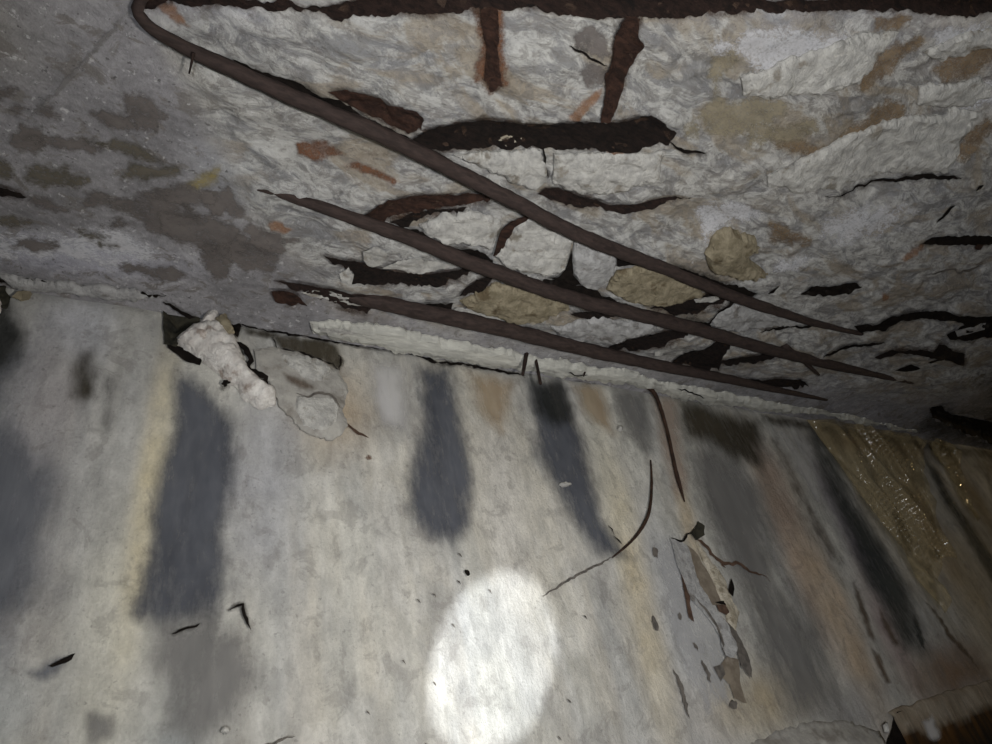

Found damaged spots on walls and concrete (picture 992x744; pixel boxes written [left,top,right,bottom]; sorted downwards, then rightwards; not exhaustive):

rust [460,0,508,95]
rust [297,141,342,161]
rust [351,162,396,185]
spalling [131,0,914,401]
peeling [767,75,992,194]
damp [177,310,276,410]
peeling [249,328,368,441]
damp [412,370,469,538]
damp [533,384,621,554]
damp [135,379,246,734]
crack [544,526,622,596]
crack [698,539,770,581]